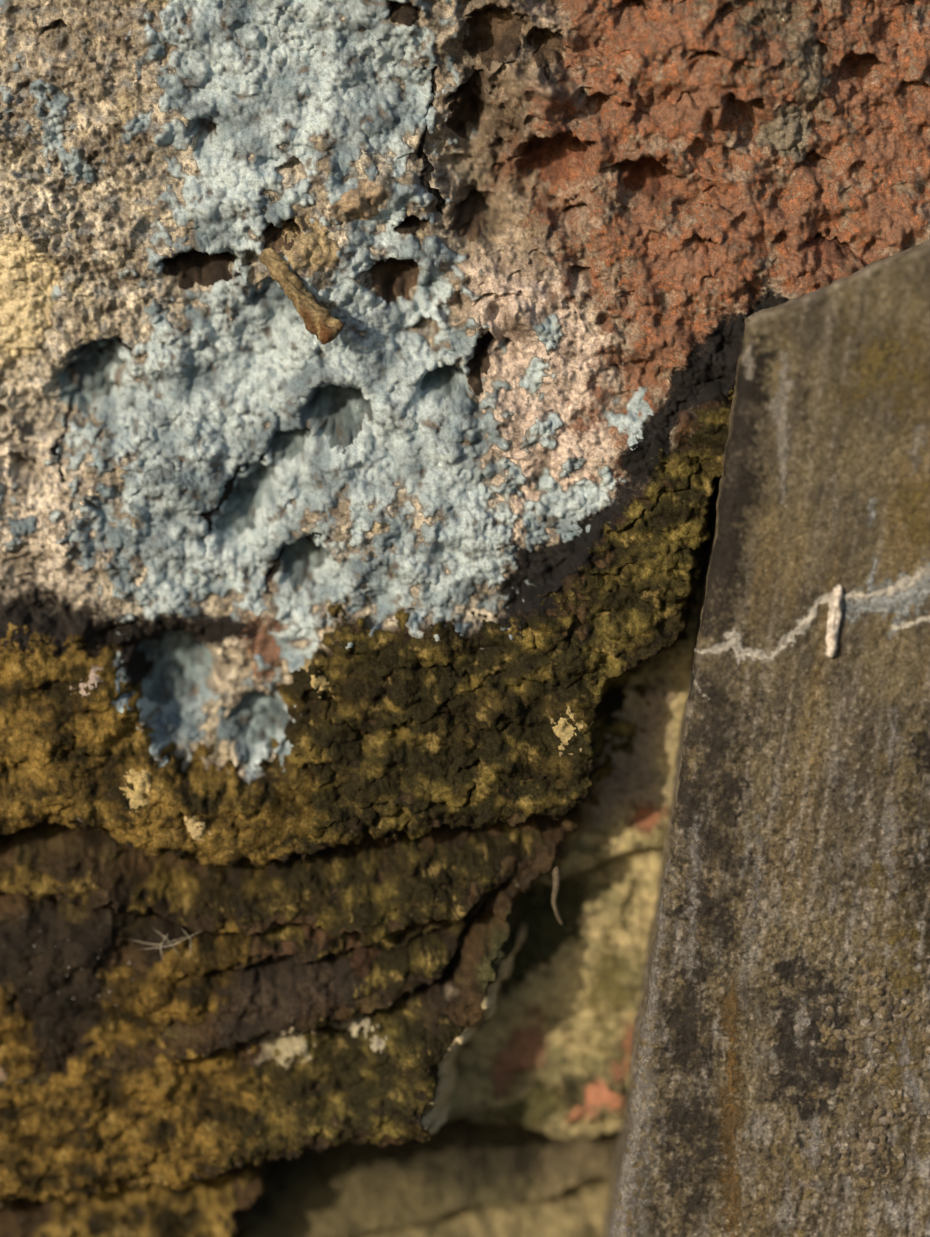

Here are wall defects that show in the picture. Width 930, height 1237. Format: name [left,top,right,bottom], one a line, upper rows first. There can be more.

crack [416,66,446,216]
corrosion [493,0,930,477]
spalling [0,0,930,778]
crack [200,445,271,552]
leakage [0,566,248,697]
leakage [119,768,154,813]
leakage [183,815,212,841]
leakage [298,653,334,698]
leakage [550,706,584,756]
leakage [0,895,132,1083]
leakage [203,945,388,1070]
leakage [608,667,765,1237]